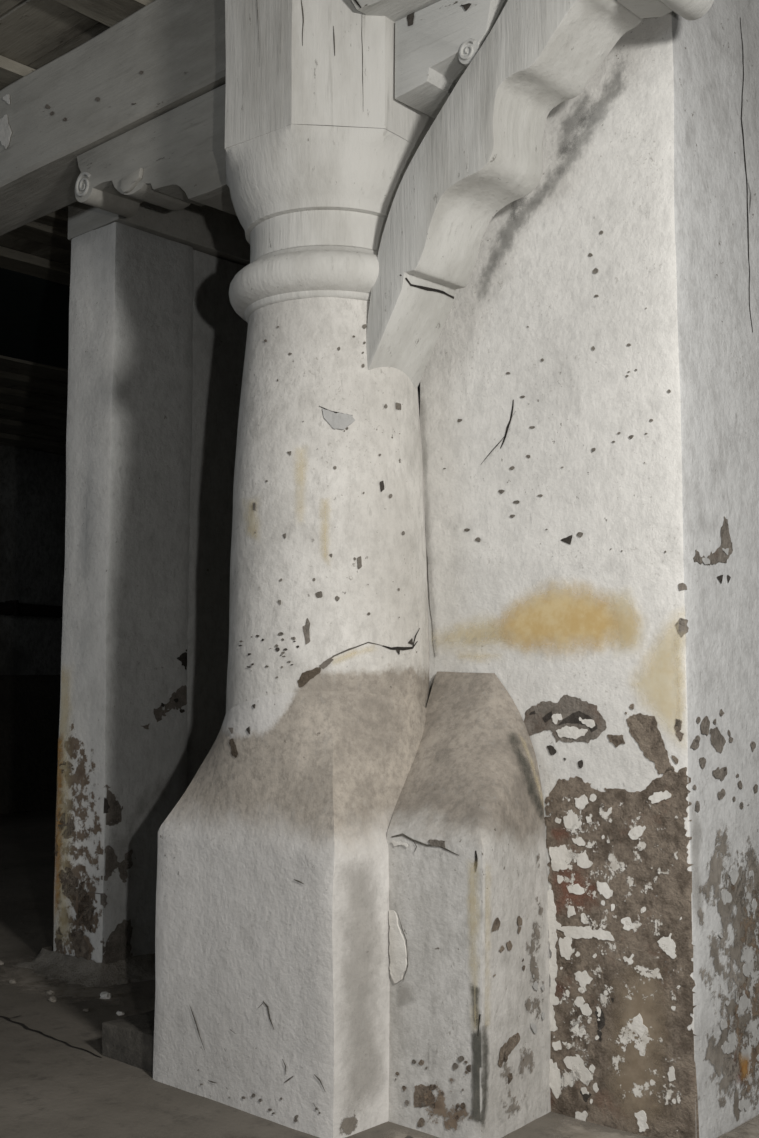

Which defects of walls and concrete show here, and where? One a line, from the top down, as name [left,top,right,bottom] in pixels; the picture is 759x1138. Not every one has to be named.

crack [400,274,454,299]
crack [482,400,516,463]
spalling [693,516,733,584]
damp [455,591,634,646]
peeling [675,618,689,637]
spalling [177,649,187,670]
spalling [142,685,187,729]
spalling [104,785,123,826]
damp [511,736,543,816]
spalling [55,845,136,964]
spalling [498,695,759,1138]
peeling [395,1056,472,1131]